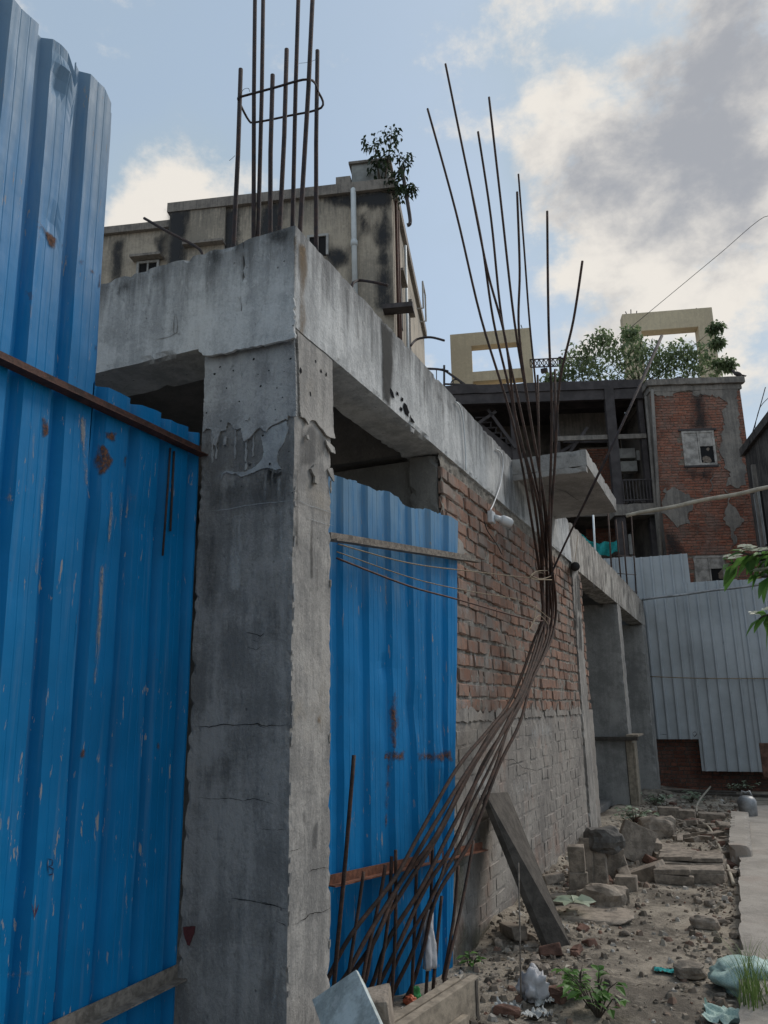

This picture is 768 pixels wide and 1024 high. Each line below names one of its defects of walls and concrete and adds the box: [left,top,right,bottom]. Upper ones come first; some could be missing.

water stain [112,241,127,290]
water stain [156,210,189,263]
water stain [327,191,392,308]
flaking render [203,325,336,493]
rust [95,433,126,474]
flaking render [327,63,598,1004]
crack [199,721,283,729]
rust [385,700,403,785]
crack [231,898,331,925]